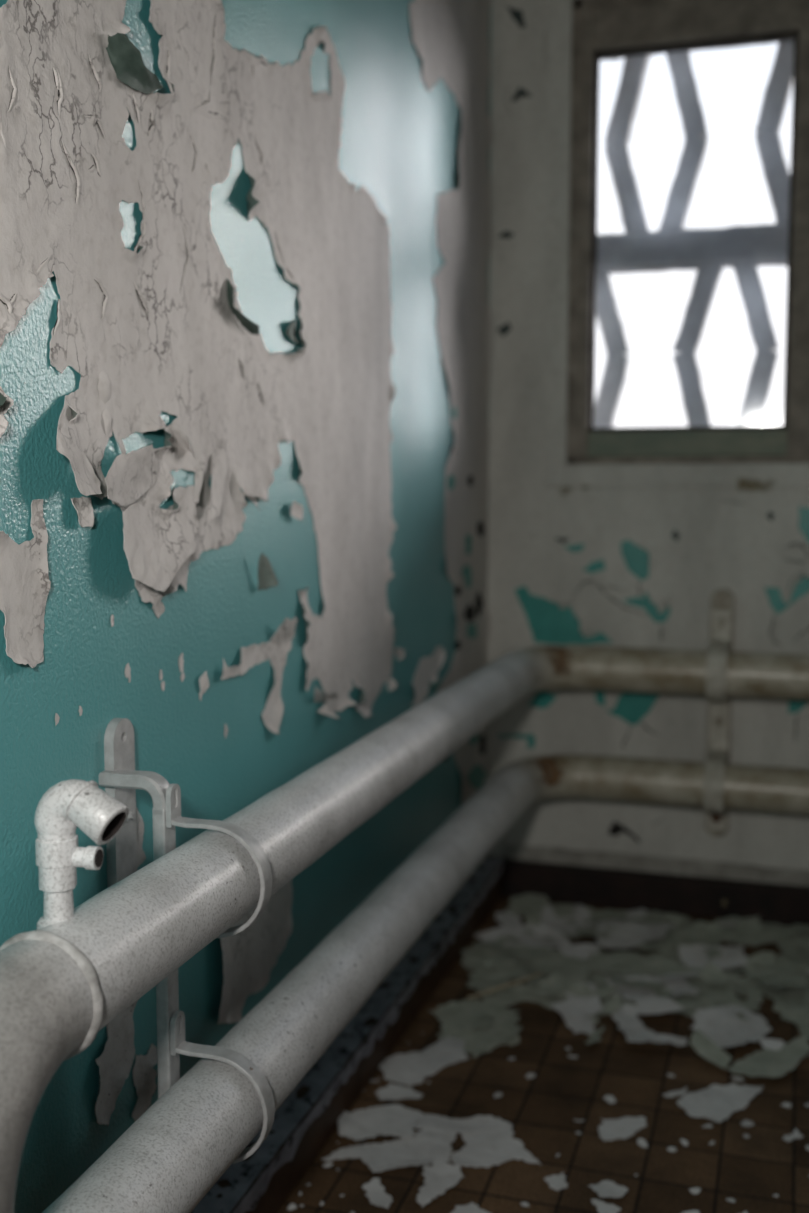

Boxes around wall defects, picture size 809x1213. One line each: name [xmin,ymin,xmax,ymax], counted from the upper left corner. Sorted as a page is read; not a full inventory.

peeling [0,0,405,719]
peeling [515,585,614,645]
peeling [621,538,674,622]
peeling [765,569,809,614]
peeling [595,690,667,726]